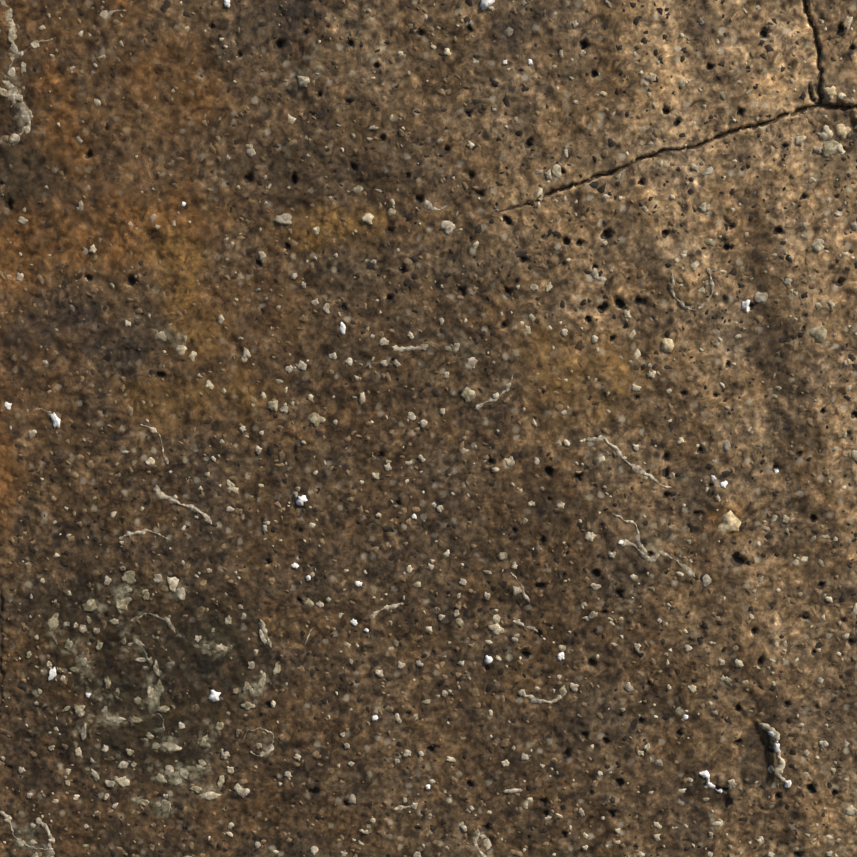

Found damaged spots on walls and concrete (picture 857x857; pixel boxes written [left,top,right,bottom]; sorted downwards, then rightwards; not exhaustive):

crack [498,0,857,212]